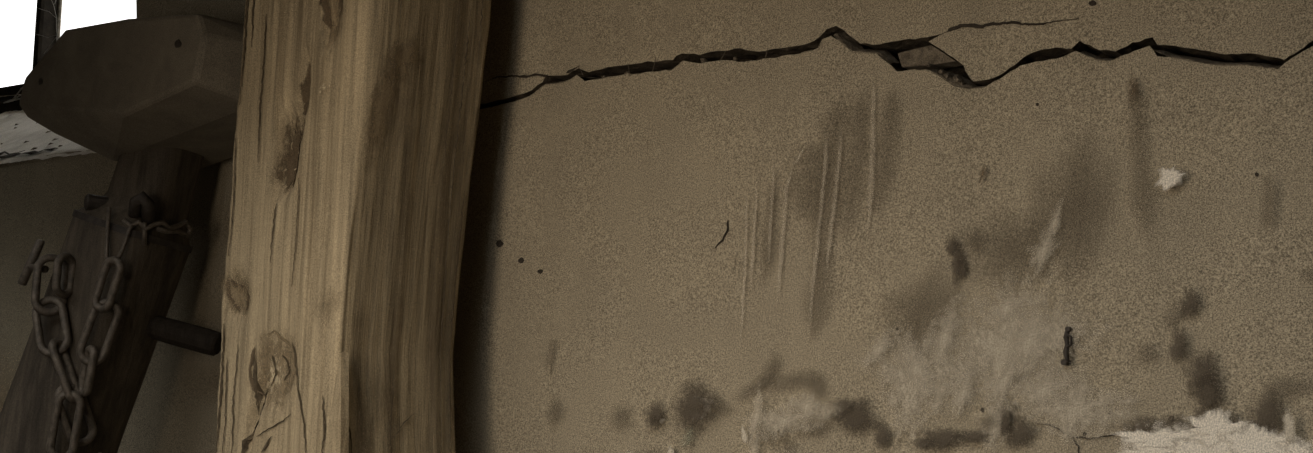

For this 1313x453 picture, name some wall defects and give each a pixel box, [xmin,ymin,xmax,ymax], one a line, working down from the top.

crack [480,18,1313,109]
crack [0,148,57,158]
leakage [741,290,1294,453]
flaking render [1117,410,1313,453]